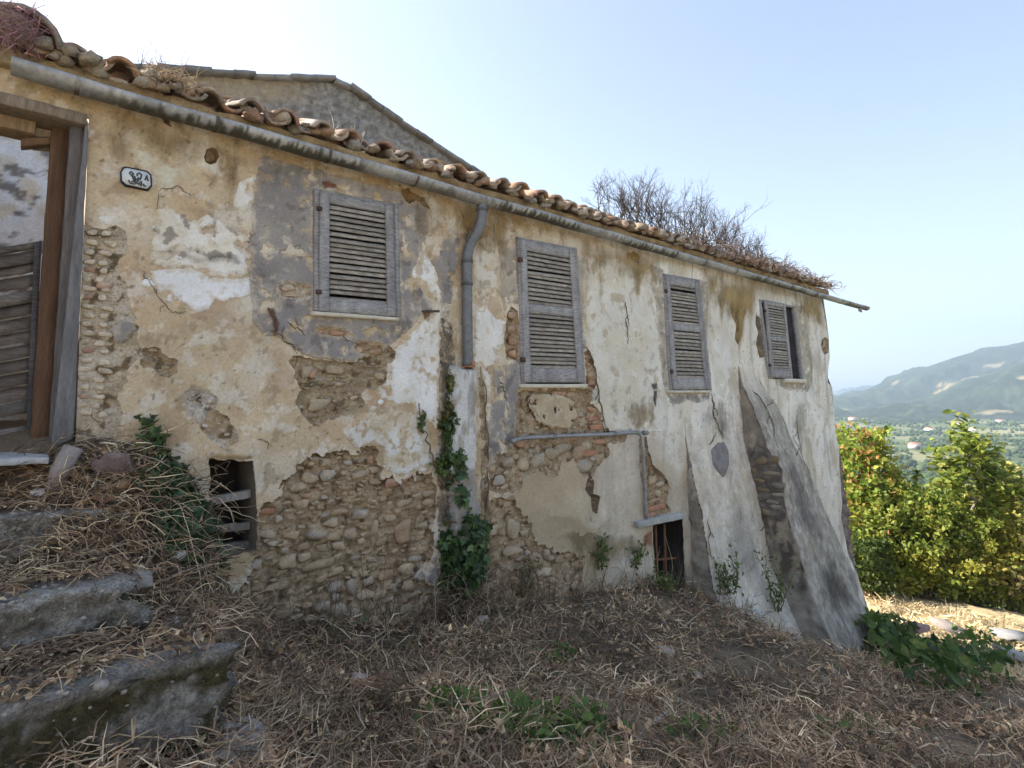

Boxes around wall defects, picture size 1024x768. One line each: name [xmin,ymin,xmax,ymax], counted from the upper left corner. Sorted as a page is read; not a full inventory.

flaking render [142,205,251,313]
damp [596,252,652,293]
spalling [75,216,178,443]
damp [710,280,755,342]
damp [800,301,821,323]
spalling [184,387,239,448]
spalling [234,240,671,626]
crack [710,393,723,444]
spalling [749,444,786,521]